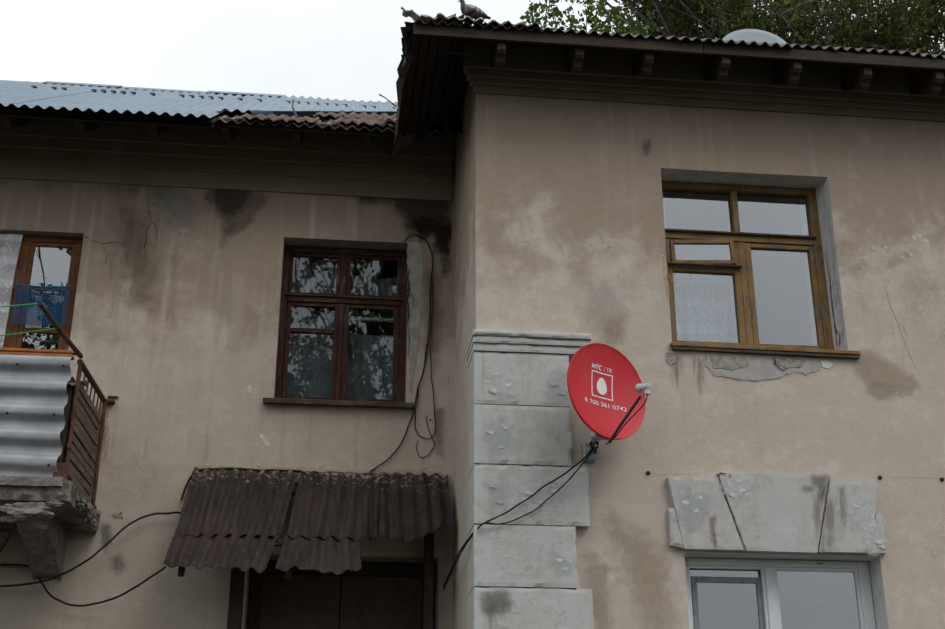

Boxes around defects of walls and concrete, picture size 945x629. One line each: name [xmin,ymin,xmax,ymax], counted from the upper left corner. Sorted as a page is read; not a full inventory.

leakage [212,189,248,214]
spalling [705,354,833,381]
spalling [0,500,64,530]
crack [817,477,830,553]